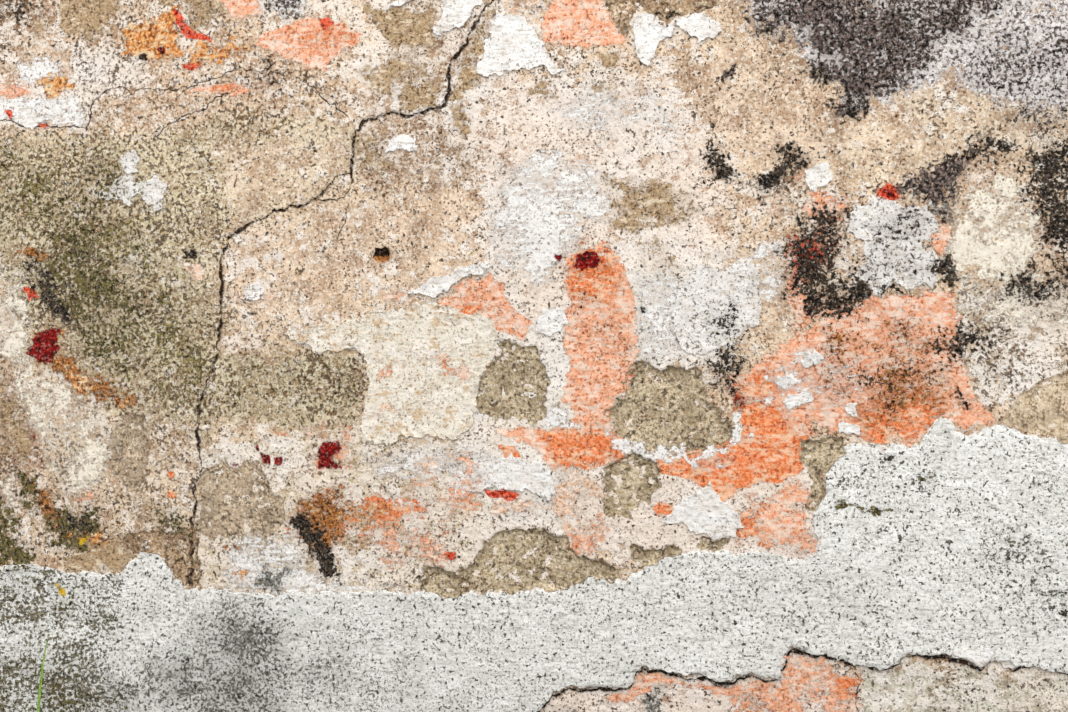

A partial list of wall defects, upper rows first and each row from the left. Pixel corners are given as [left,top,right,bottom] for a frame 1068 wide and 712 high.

peeling [0,13,85,130]
crack [187,0,494,585]
flaking render [352,129,418,176]
peeling [159,0,722,153]
mould [729,0,1068,433]
peeling [63,148,1068,601]
peeling [603,653,864,712]
peeling [953,645,1019,669]